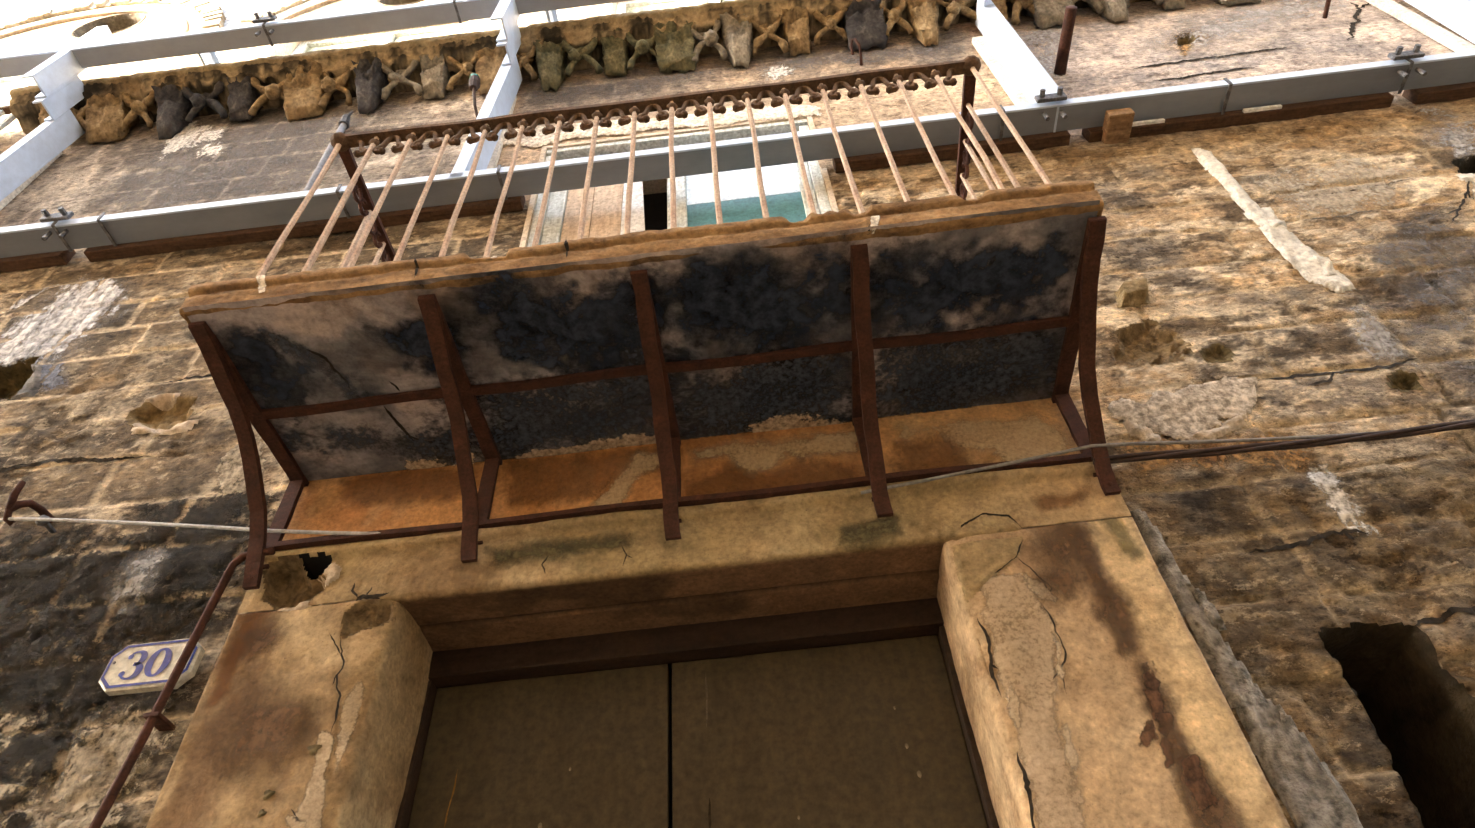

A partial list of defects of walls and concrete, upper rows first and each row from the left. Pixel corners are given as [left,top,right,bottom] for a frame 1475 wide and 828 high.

peeling [1456,173,1475,182]
spalling [0,356,43,401]
spalling [125,393,199,436]
spalling [261,552,342,612]
crack [961,513,1067,695]
crack [330,583,388,735]
water stain [1036,523,1246,828]
crack [1017,752,1035,828]